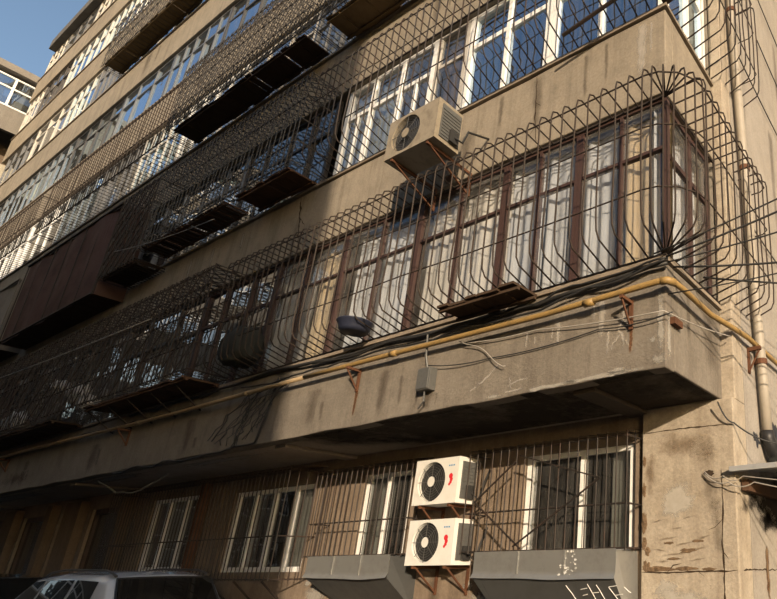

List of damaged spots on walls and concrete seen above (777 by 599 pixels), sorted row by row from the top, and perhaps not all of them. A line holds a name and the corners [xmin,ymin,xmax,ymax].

spalling [641,513,717,572]
crack [643,472,777,599]